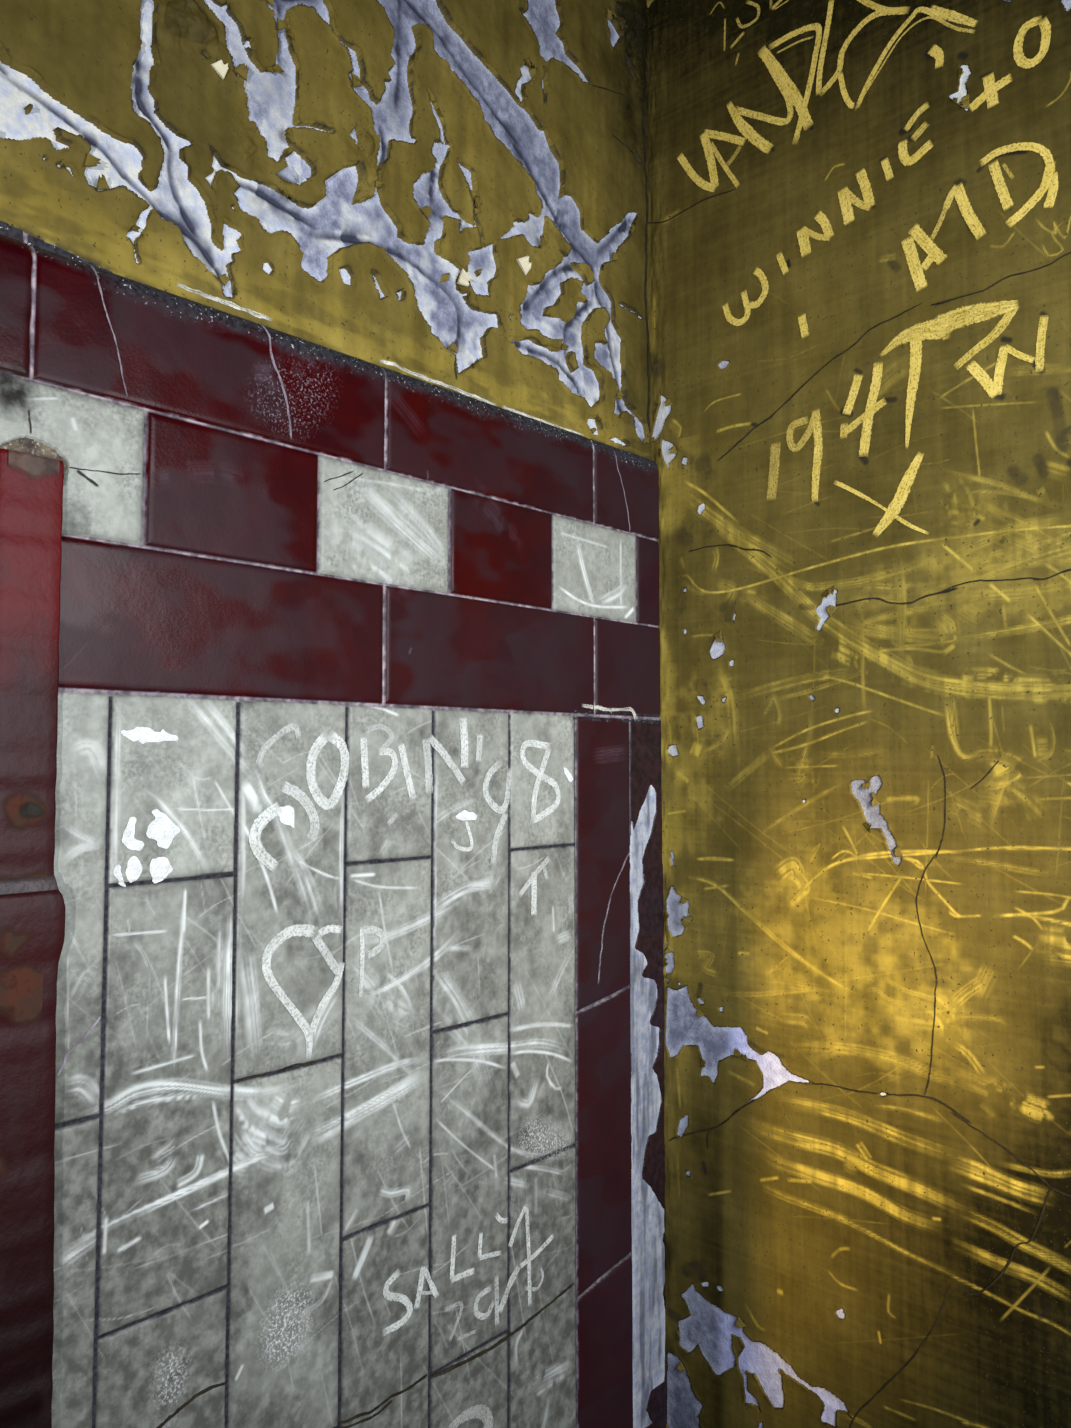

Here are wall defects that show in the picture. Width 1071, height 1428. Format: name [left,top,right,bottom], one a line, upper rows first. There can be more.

peeling [950,65,971,111]
peeling [0,0,687,468]
crack [720,252,1071,459]
crack [816,569,1071,609]
peeling [851,776,903,865]
crack [669,1096,756,1147]
peeling [630,785,848,1428]
crack [814,756,1071,1428]